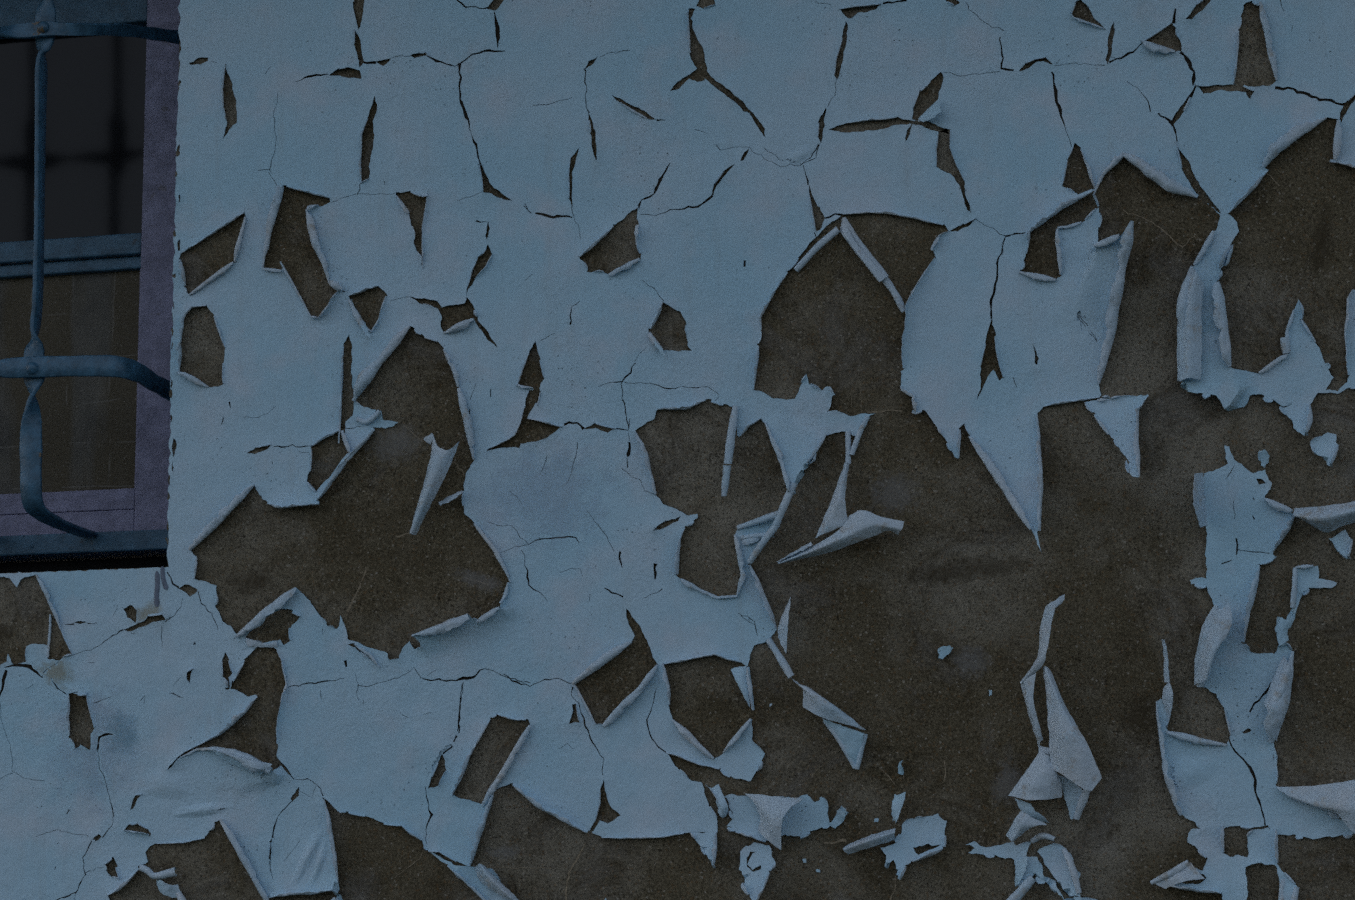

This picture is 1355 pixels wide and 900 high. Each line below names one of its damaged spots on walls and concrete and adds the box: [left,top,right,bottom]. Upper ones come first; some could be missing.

crack [190,58,237,137]
crack [296,0,765,239]
crack [783,110,948,235]
peeling [912,72,970,211]
crack [1145,0,1355,213]
crack [222,336,361,454]
peeling [169,185,512,776]
peeling [450,116,1355,900]
crack [951,217,1025,396]
peeling [0,574,74,665]
crack [0,572,216,900]
peeling [103,799,487,900]